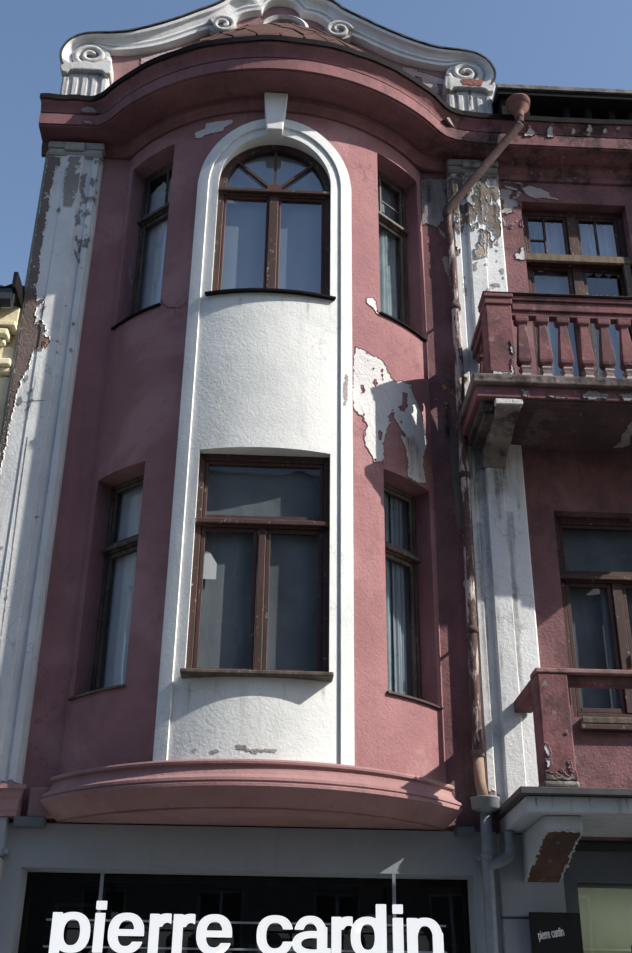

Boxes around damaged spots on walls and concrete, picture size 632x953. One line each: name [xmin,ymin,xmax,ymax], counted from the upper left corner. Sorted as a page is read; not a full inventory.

peeling [140,42,195,65]
peeling [401,66,444,94]
peeling [193,119,234,139]
peeling [523,125,555,138]
peeling [420,172,562,297]
peeling [0,156,101,475]
peeling [581,390,632,402]
peeling [343,346,429,485]
flaking render [613,422,632,448]
flaking render [543,742,579,781]